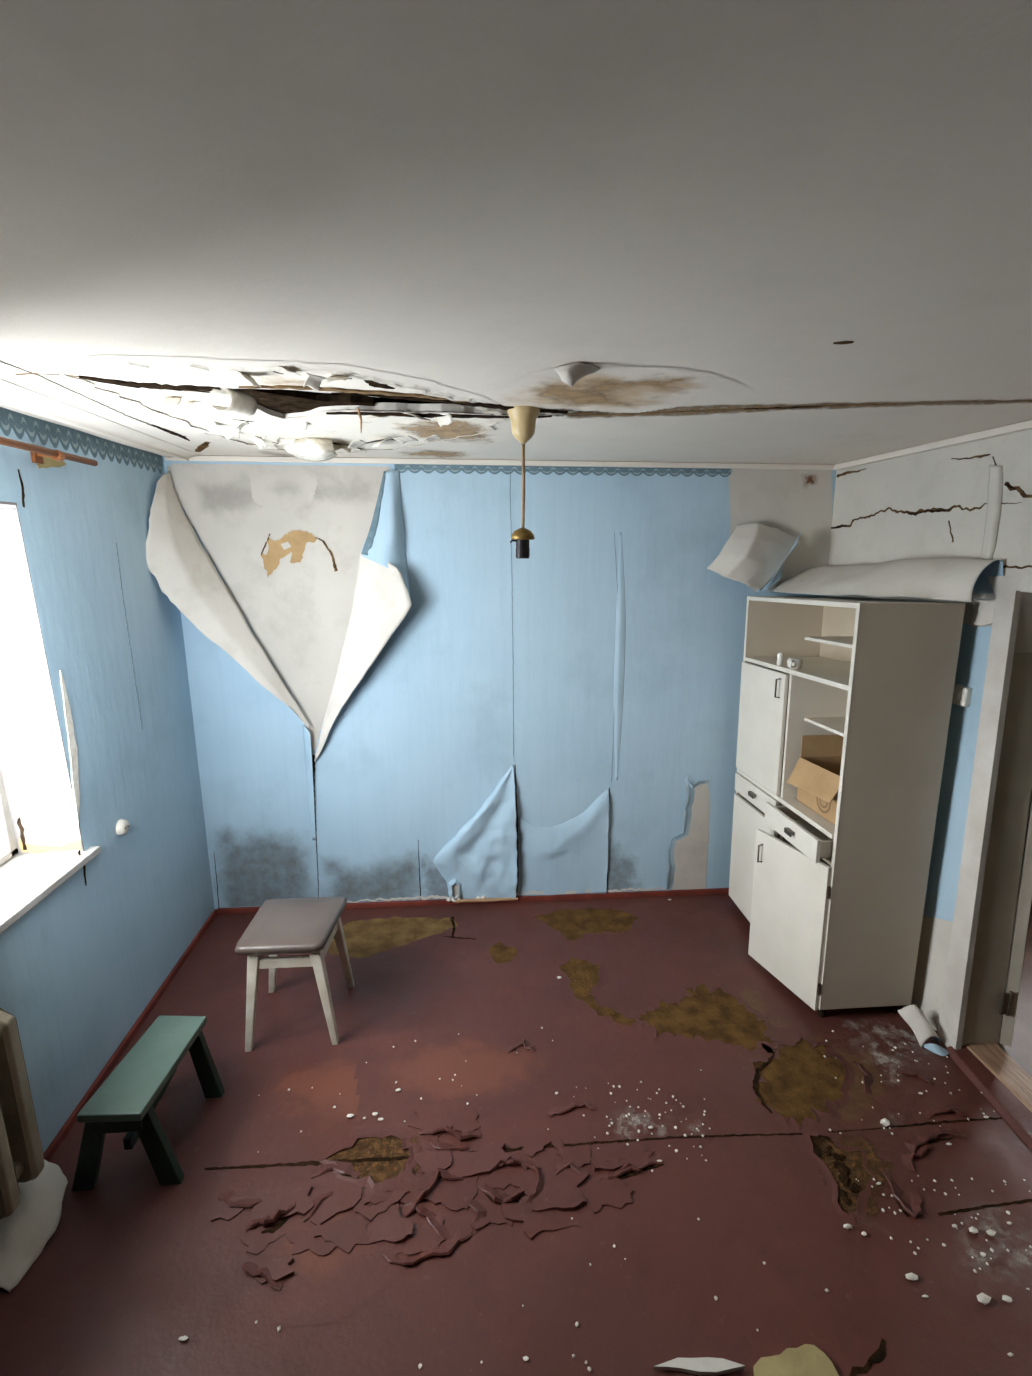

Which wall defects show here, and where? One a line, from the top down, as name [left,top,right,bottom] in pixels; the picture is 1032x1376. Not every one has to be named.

leakage [491,363,741,417]
crack [566,400,1032,418]
flaking render [19,355,511,753]
flaking render [729,464,832,592]
crack [831,454,1032,542]
crack [1003,563,1032,571]
peeling [634,981,879,1234]